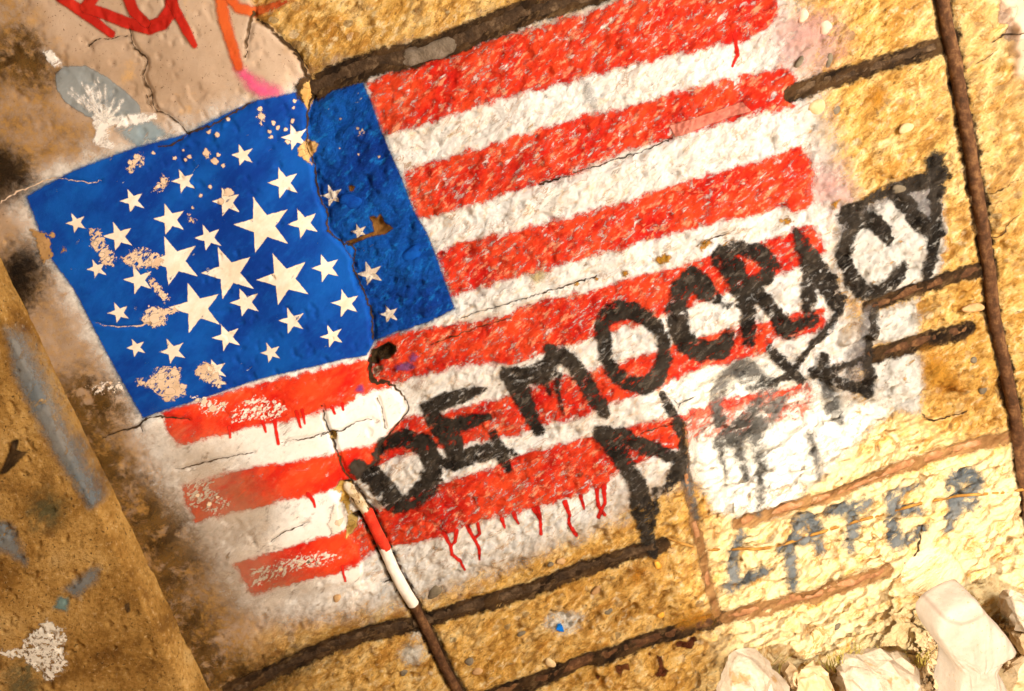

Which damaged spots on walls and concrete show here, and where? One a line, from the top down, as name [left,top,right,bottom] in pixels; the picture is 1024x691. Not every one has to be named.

crack [88,28,254,147]
spalling [256,0,610,164]
crack [245,11,409,481]
spalling [347,214,393,244]
peeling [89,228,179,328]
spalling [368,342,397,377]
peeling [135,360,287,423]
crack [103,415,190,438]
crack [176,452,253,469]
rust [676,636,698,649]
rust [648,652,668,677]